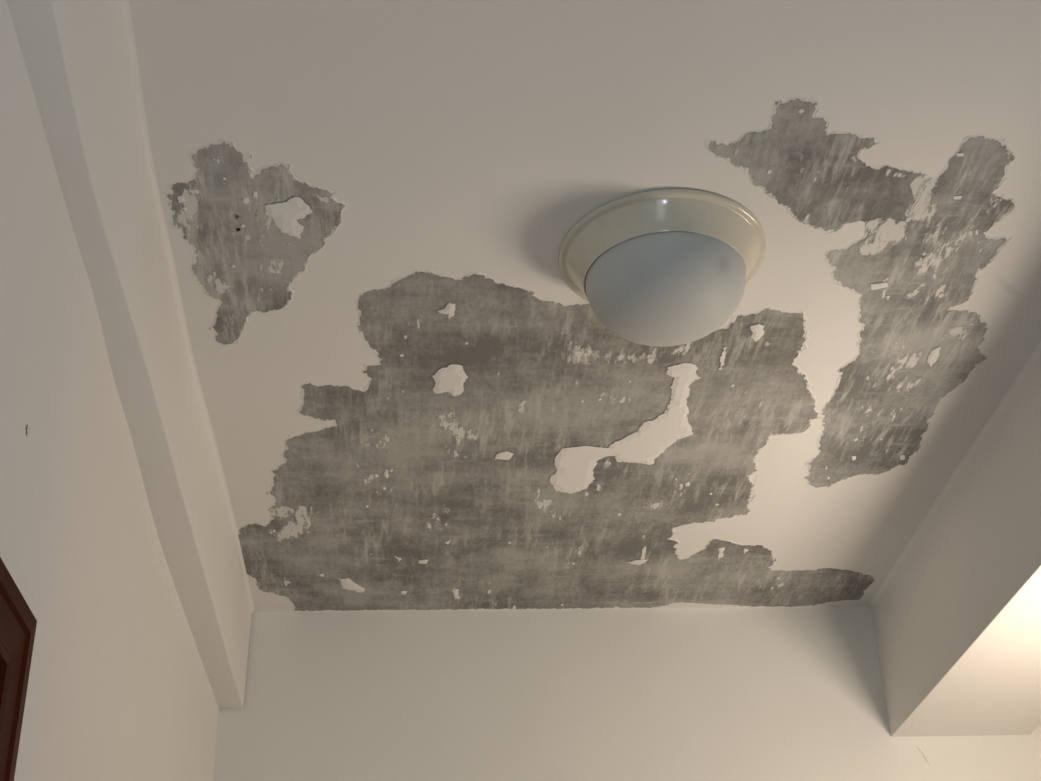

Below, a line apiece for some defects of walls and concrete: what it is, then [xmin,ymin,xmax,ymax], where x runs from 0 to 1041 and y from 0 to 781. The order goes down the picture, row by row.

peeling [164,138,349,346]
peeling [238,96,1018,611]